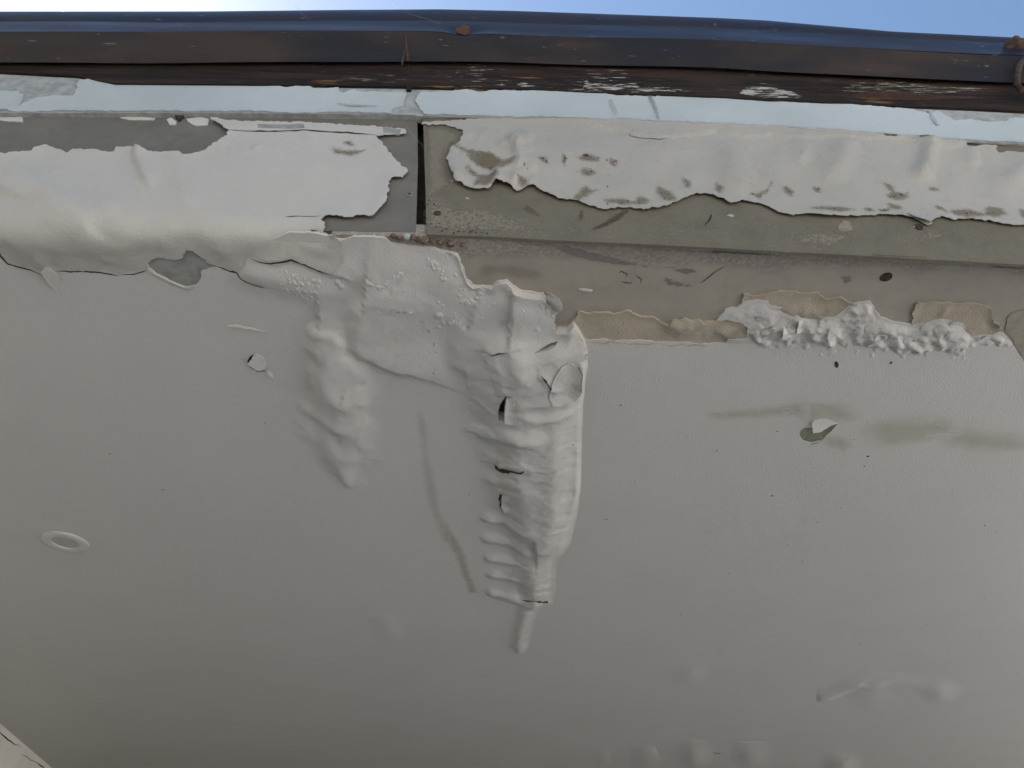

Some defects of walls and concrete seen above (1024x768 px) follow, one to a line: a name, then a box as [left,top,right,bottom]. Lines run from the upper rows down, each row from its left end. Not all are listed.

peeling [0,79,1024,293]
peeling [800,418,839,447]